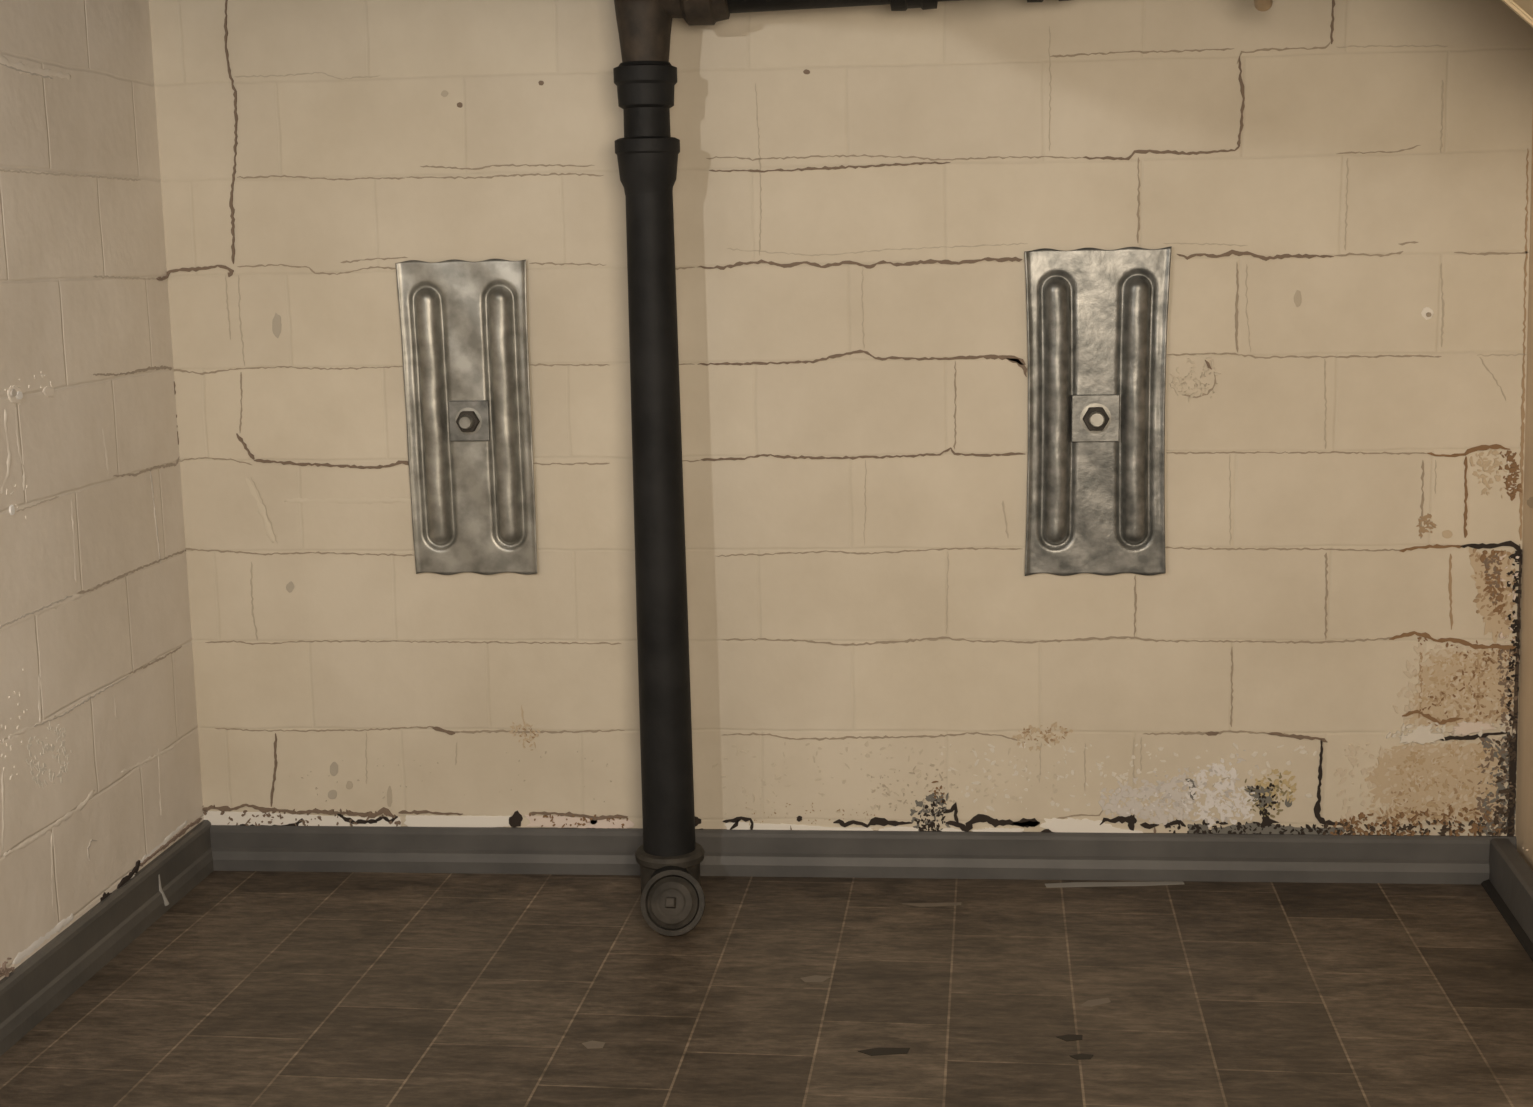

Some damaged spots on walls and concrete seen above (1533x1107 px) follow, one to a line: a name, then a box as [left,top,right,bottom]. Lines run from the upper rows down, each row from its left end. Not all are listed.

crack [0,0,622,727]
crack [675,0,1529,833]
water stain [1416,514,1437,537]
water stain [1470,449,1533,509]
water stain [712,544,1522,837]